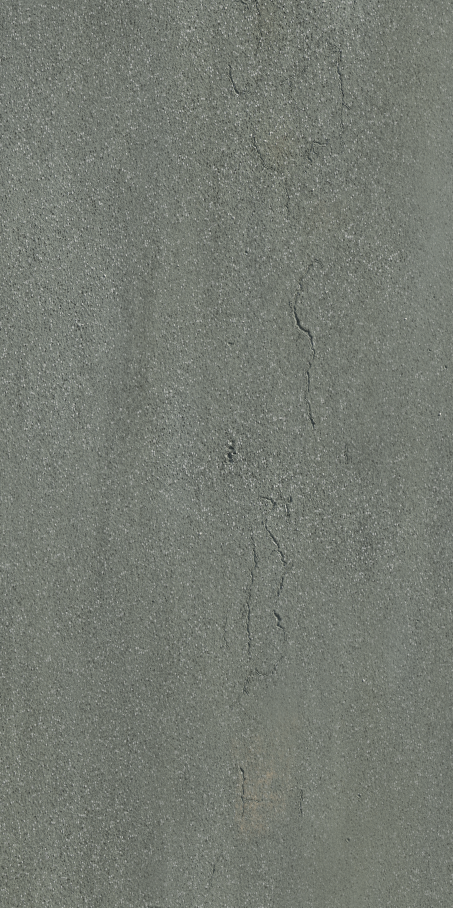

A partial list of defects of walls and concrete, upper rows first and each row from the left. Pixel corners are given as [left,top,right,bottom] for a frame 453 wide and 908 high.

crack [227,65,255,97]
crack [243,0,262,54]
crack [252,39,350,220]
crack [290,259,324,431]
crack [220,493,295,710]